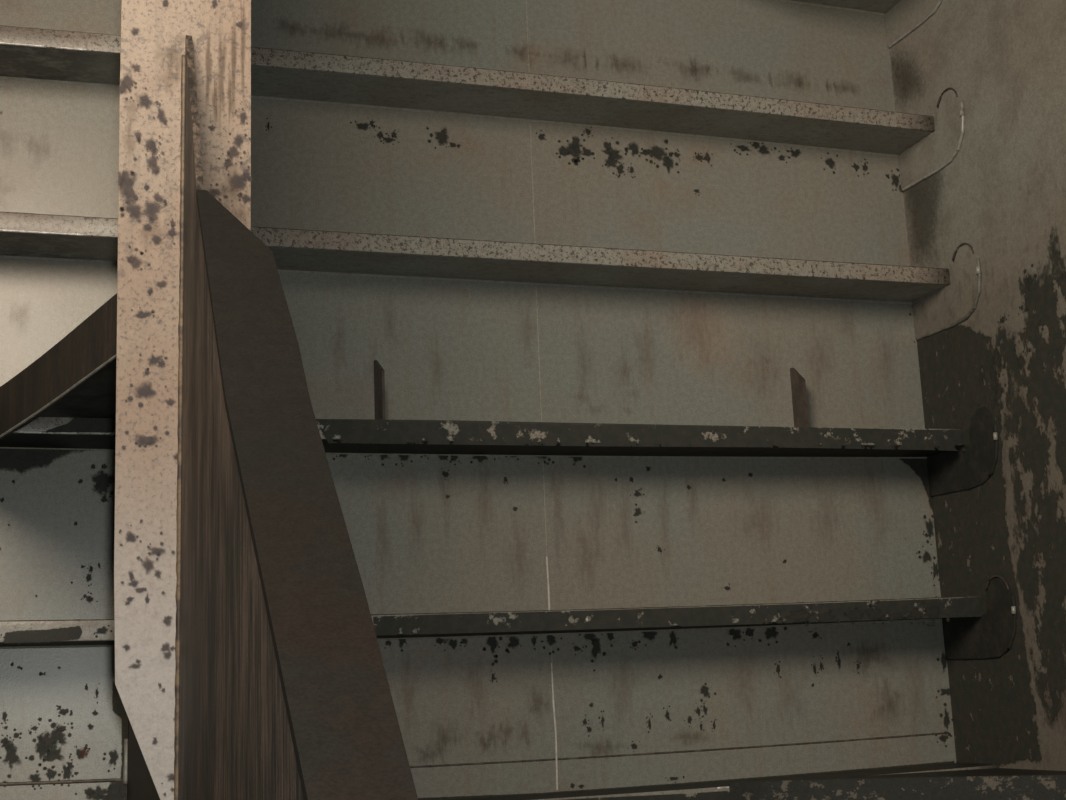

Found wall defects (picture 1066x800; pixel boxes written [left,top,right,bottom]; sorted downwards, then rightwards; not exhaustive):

peeling [979,228,1066,724]